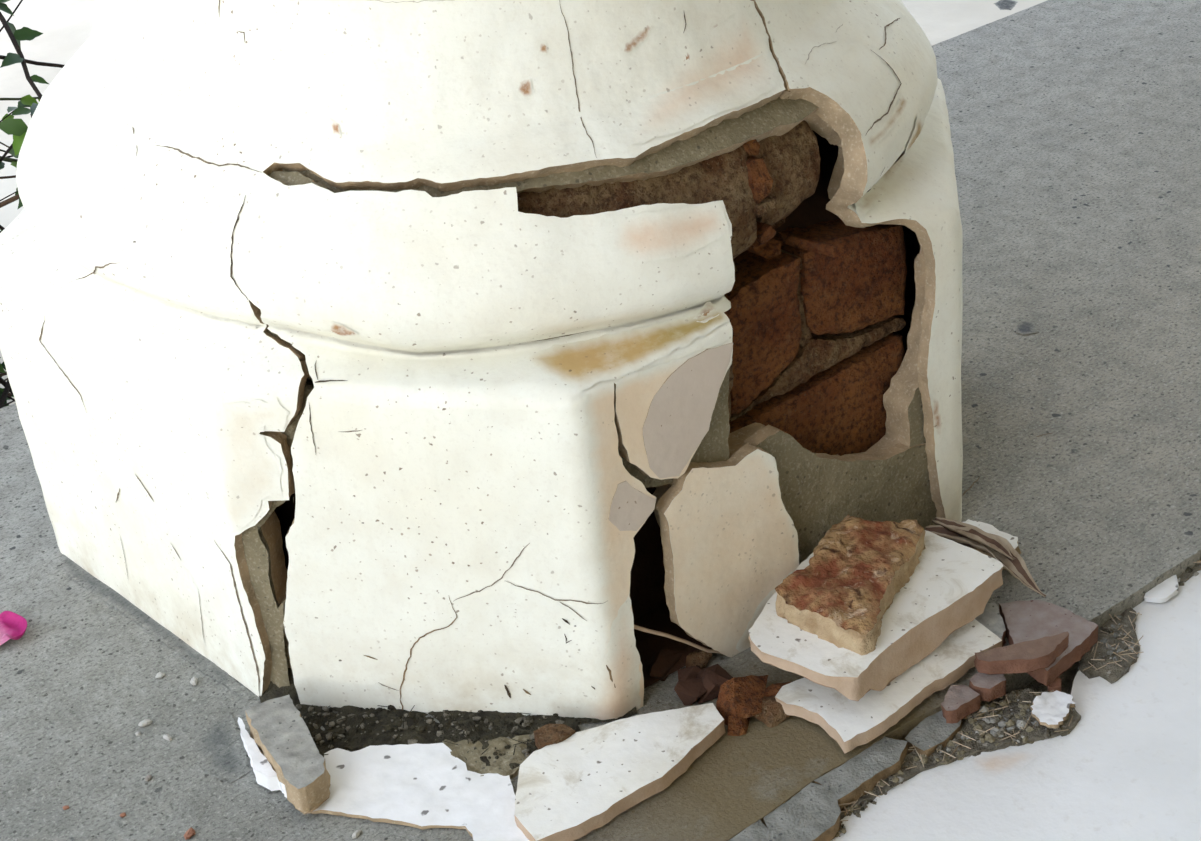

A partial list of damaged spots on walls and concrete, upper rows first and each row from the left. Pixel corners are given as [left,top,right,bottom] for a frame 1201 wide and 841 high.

crack [559,0,597,158]
crack [751,0,843,92]
spalling [517,120,939,565]
spalling [242,497,294,688]
crack [378,545,607,710]